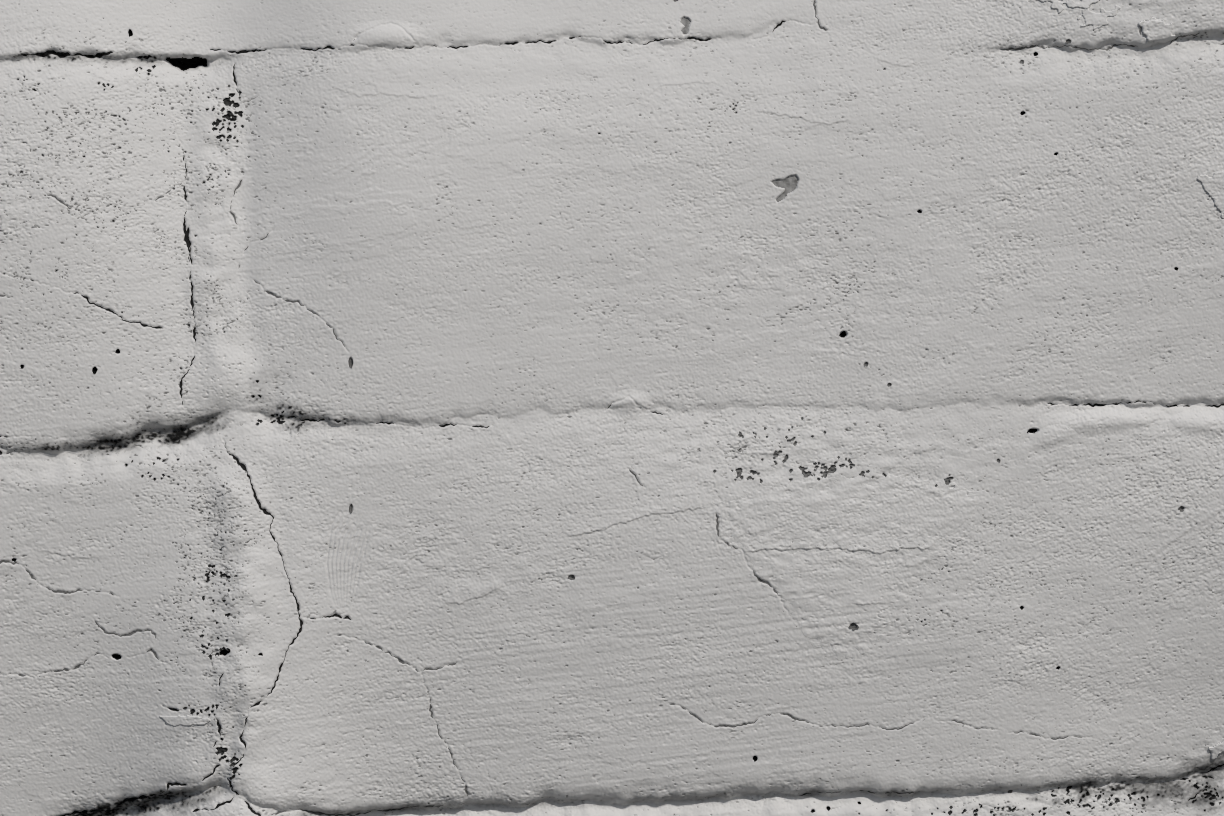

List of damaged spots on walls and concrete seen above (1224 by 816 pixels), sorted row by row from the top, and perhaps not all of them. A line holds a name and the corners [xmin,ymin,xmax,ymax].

crack [504,36,711,45]
crack [210,49,267,102]
peeling [772,175,798,202]
crack [230,180,344,345]
crack [74,292,162,328]
crack [0,560,113,595]
crack [61,443,468,816]
crack [18,621,159,676]
crack [671,704,913,730]